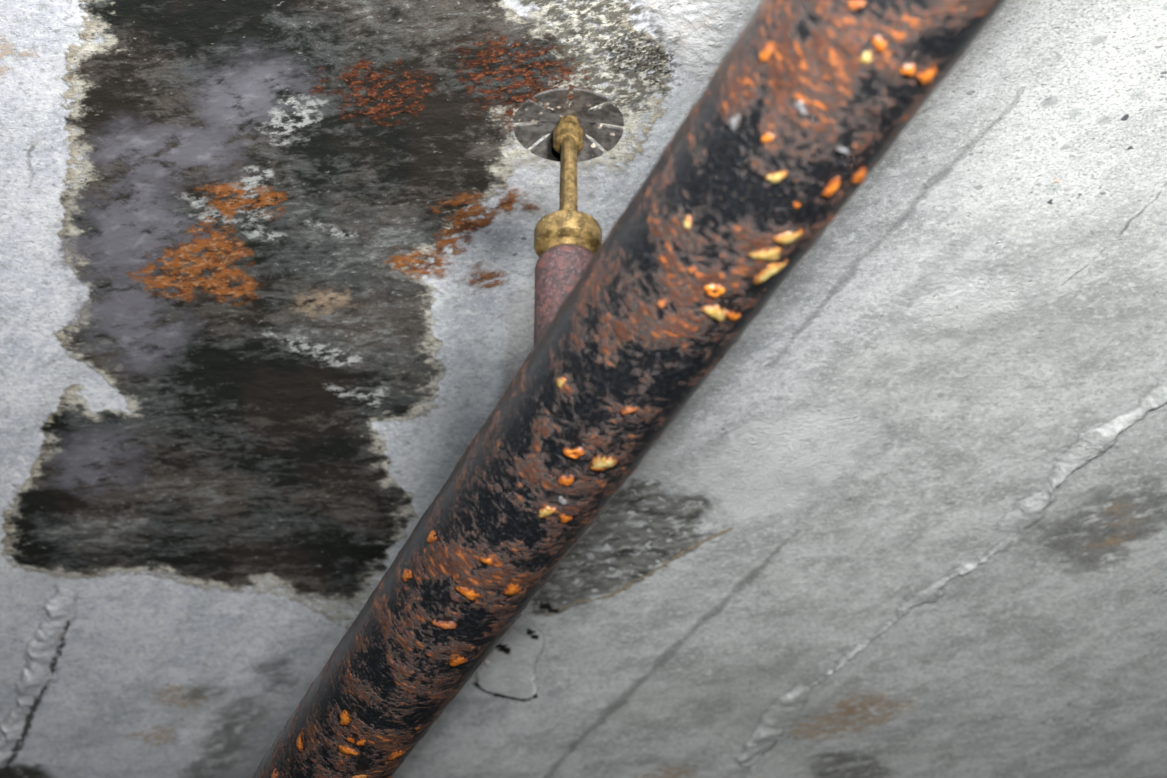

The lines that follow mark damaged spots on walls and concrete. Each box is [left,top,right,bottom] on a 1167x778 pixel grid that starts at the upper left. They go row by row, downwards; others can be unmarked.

corrosion [311,59,436,126]
corrosion [457,33,589,130]
mould [521,0,681,116]
damp [68,64,326,370]
corrosion [130,183,286,305]
efflorescence [263,331,363,367]
efflorescence [327,385,389,407]
peeling [1,0,762,630]
corrosion [387,188,537,278]
corrosion [470,266,503,287]
damp [57,432,138,491]
crack [5,620,70,768]